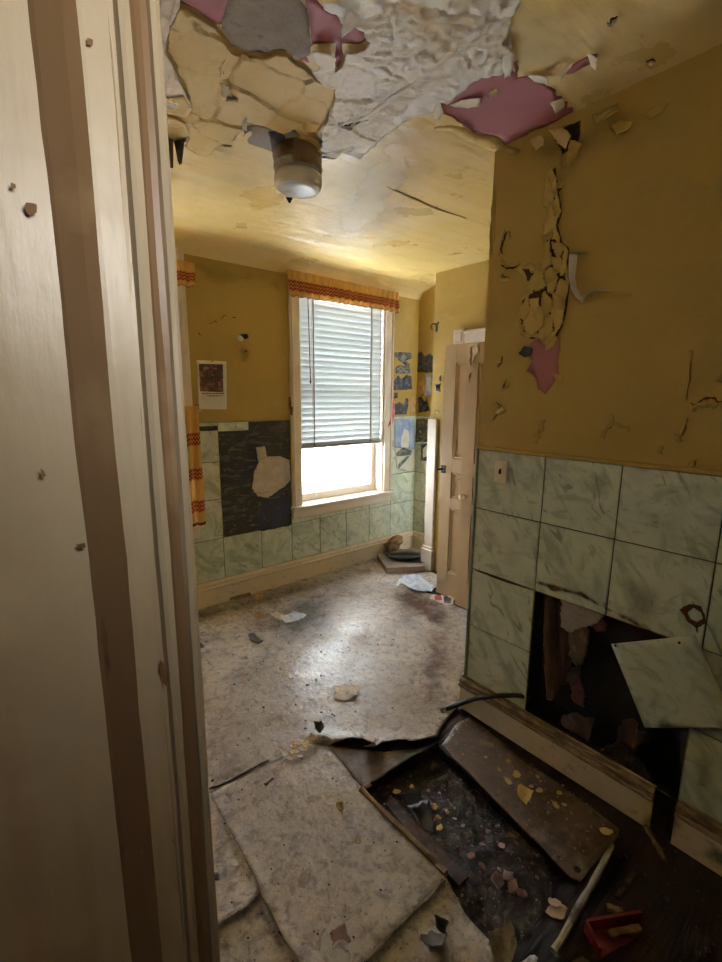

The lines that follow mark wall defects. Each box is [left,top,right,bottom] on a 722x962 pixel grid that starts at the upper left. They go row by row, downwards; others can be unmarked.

peeling [159,0,634,394]
crack [383,185,466,219]
crack [489,191,520,282]
peeling [218,397,293,537]
spalling [534,594,689,786]
crack [209,759,268,789]
peeling [517,783,534,805]